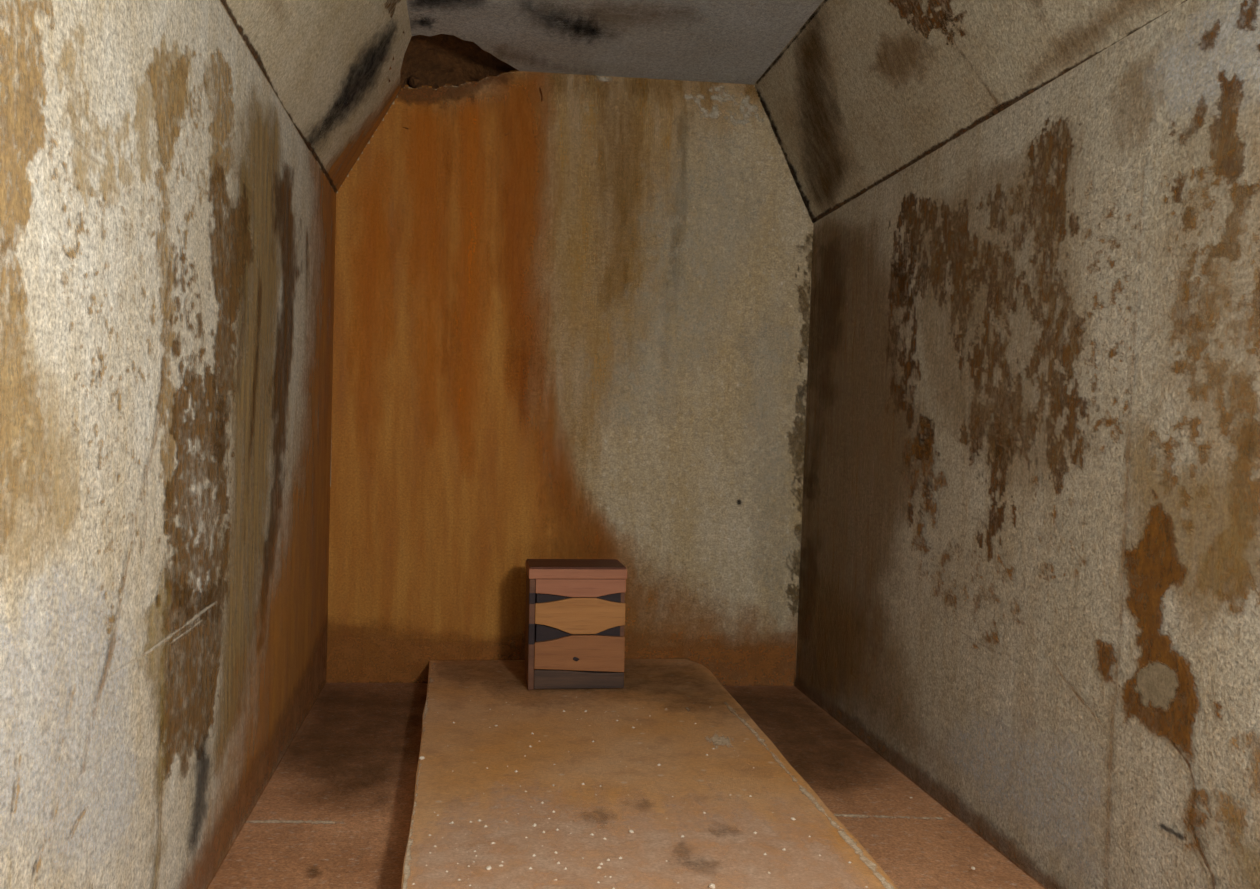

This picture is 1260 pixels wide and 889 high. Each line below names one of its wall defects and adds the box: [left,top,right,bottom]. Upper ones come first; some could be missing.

water stain [309,28,395,145]
water stain [415,0,477,26]
spalling [389,31,519,90]
water stain [191,101,308,846]
rust [224,81,608,818]
rust [624,574,751,650]
crack [1170,739,1215,889]